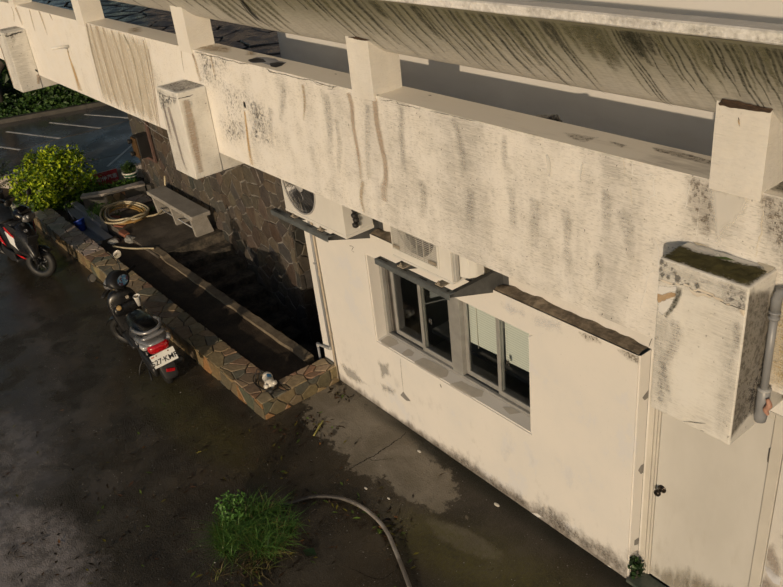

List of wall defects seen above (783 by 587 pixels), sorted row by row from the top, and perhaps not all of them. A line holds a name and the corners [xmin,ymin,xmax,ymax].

leakage [200,0,279,27]
leakage [290,0,783,107]
leakage [348,94,359,155]
leakage [366,101,387,188]
leakage [690,180,744,234]
mould [764,183,783,245]
peeling [657,279,745,316]